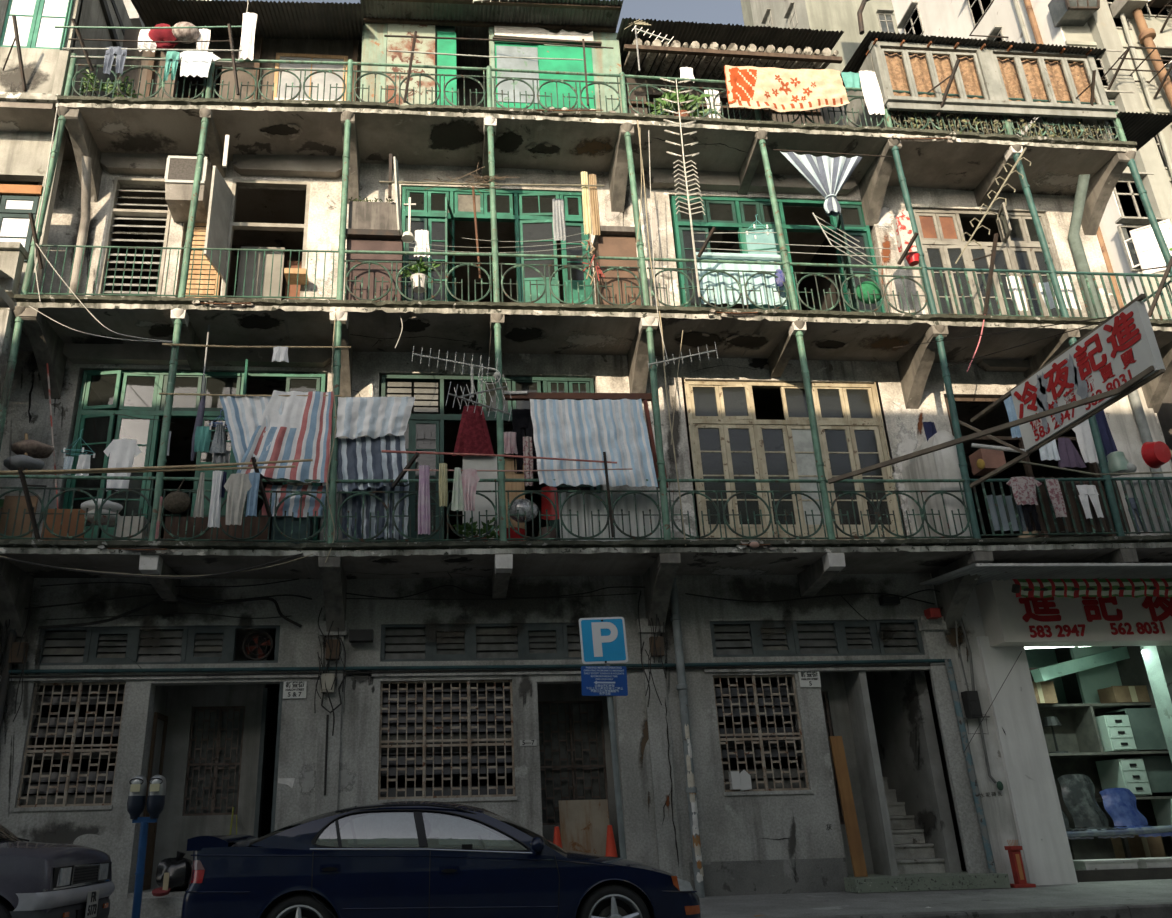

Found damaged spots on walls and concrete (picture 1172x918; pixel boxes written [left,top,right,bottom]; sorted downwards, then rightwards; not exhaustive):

water stain [0,64,48,93]
water stain [574,138,613,156]
crack [662,701,679,866]